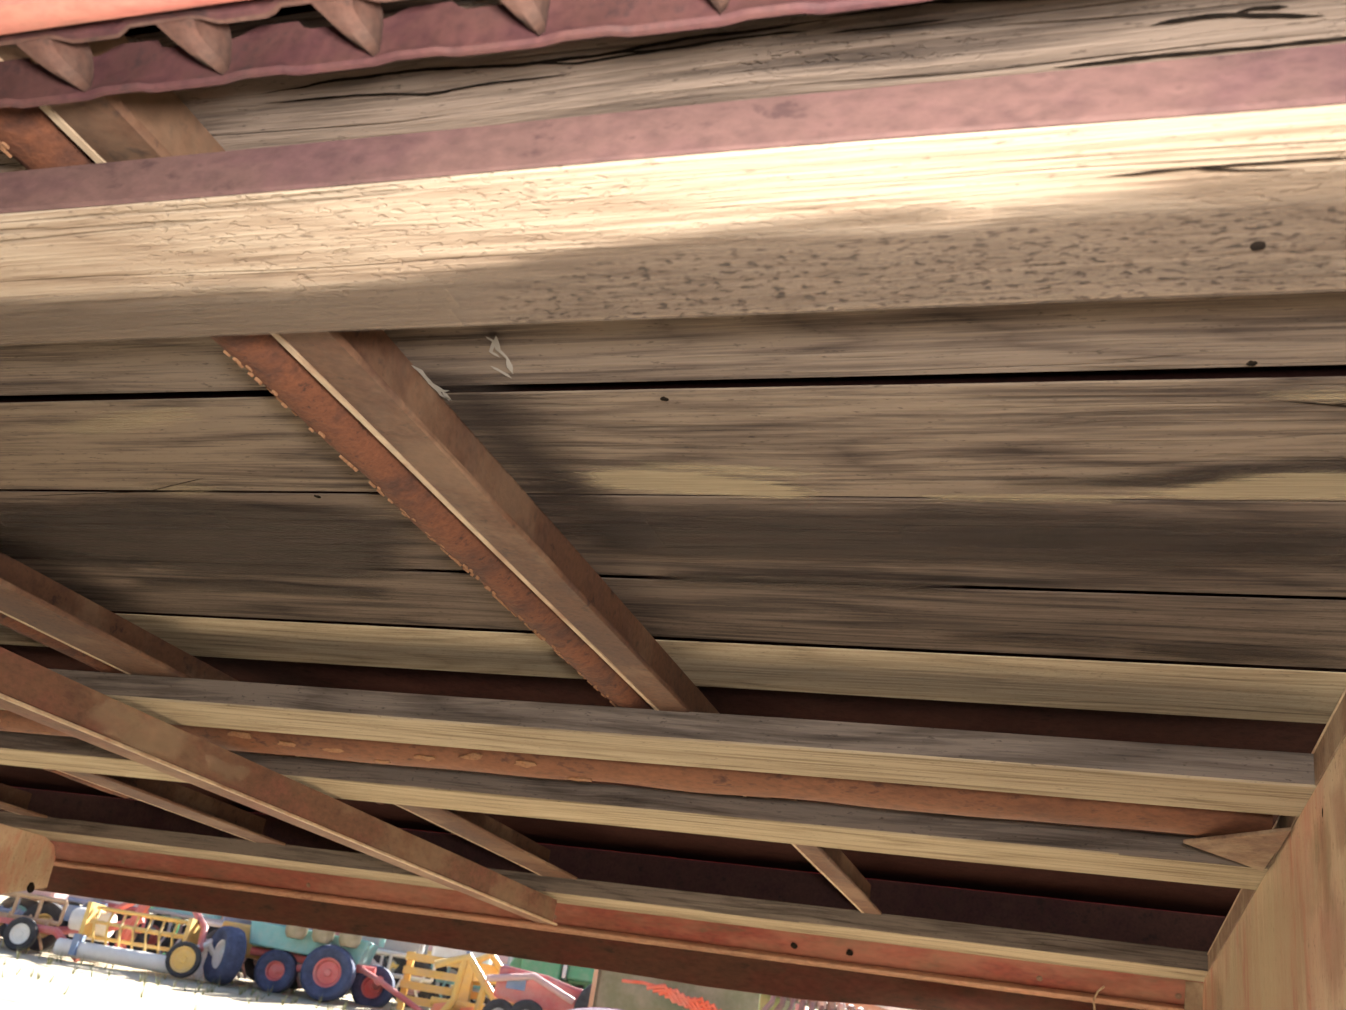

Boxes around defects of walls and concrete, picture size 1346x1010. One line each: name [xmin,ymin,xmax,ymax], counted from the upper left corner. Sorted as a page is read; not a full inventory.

crack [262,0,1013,103]
crack [1054,5,1346,68]